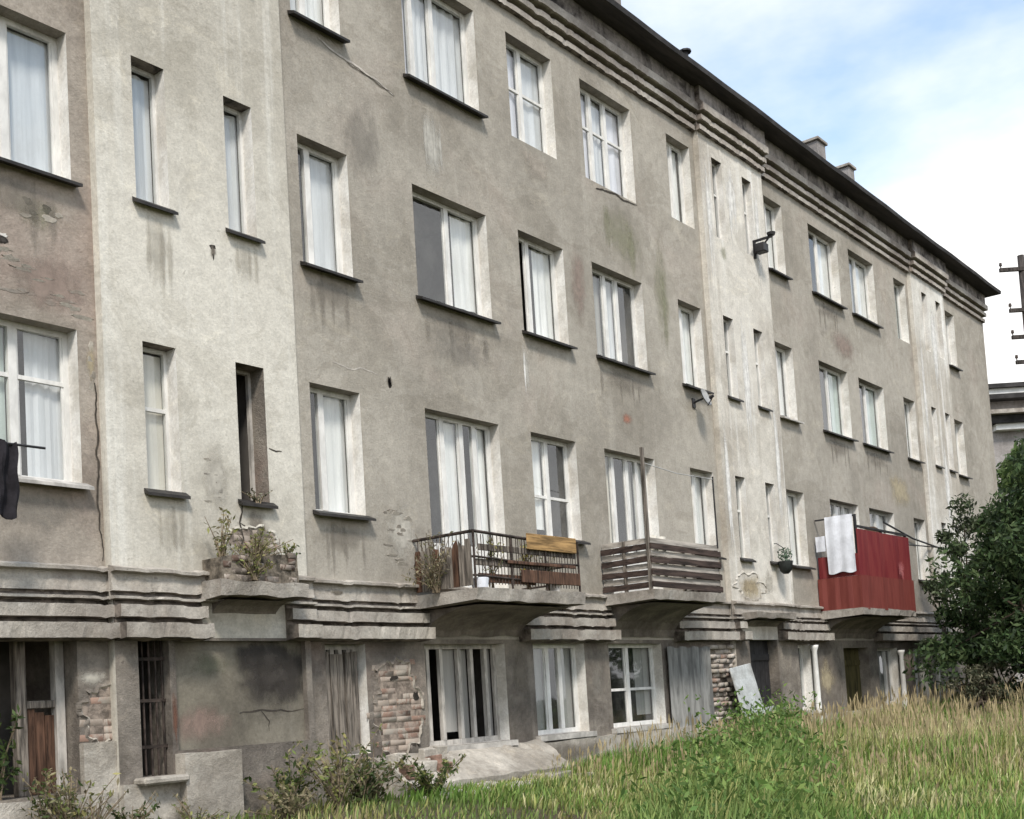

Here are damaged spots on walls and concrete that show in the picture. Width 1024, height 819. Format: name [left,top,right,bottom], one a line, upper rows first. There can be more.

crack [319,38,393,95]
flaking render [19,198,63,223]
crack [94,383,104,561]
flaking render [731,570,772,602]
damp [239,645,301,701]
flaking render [76,673,112,743]
crack [240,708,304,731]
flaking render [366,655,426,755]